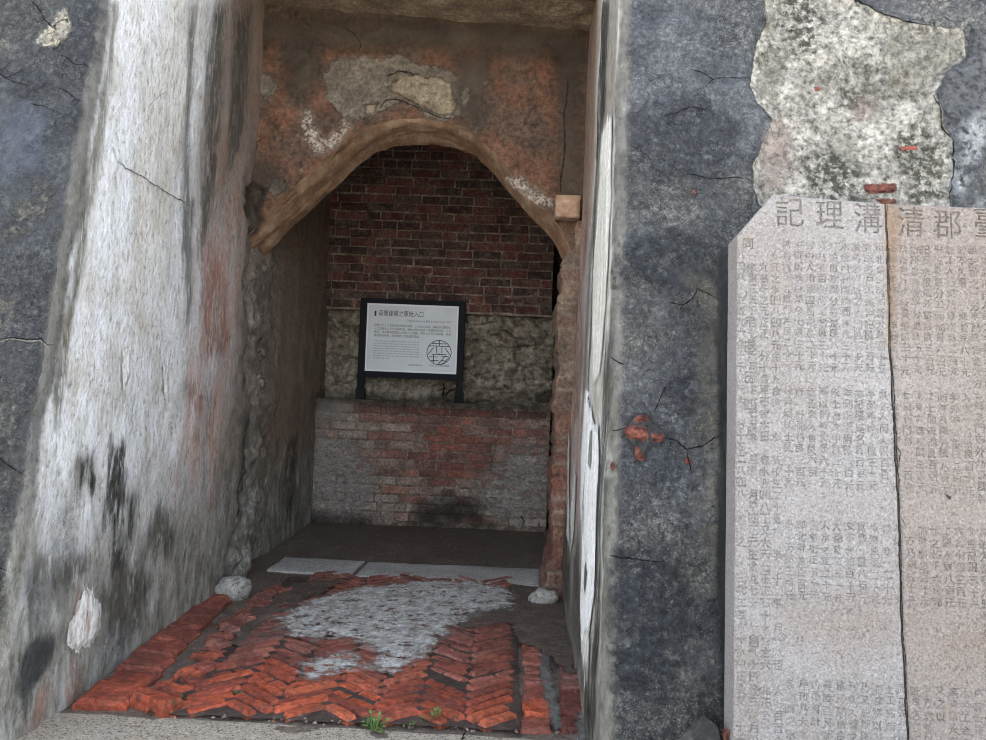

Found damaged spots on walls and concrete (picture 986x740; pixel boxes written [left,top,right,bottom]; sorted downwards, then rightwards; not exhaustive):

peeling [36,0,103,60]
peeling [322,53,471,122]
spalling [750,0,966,207]
crack [117,161,189,206]
crack [0,337,52,348]
peeling [665,372,701,407]
spalling [623,413,666,464]
leakage [76,440,149,661]
leakage [149,507,174,558]
peeling [580,389,615,653]
leakage [18,508,88,711]
peeling [66,586,101,654]